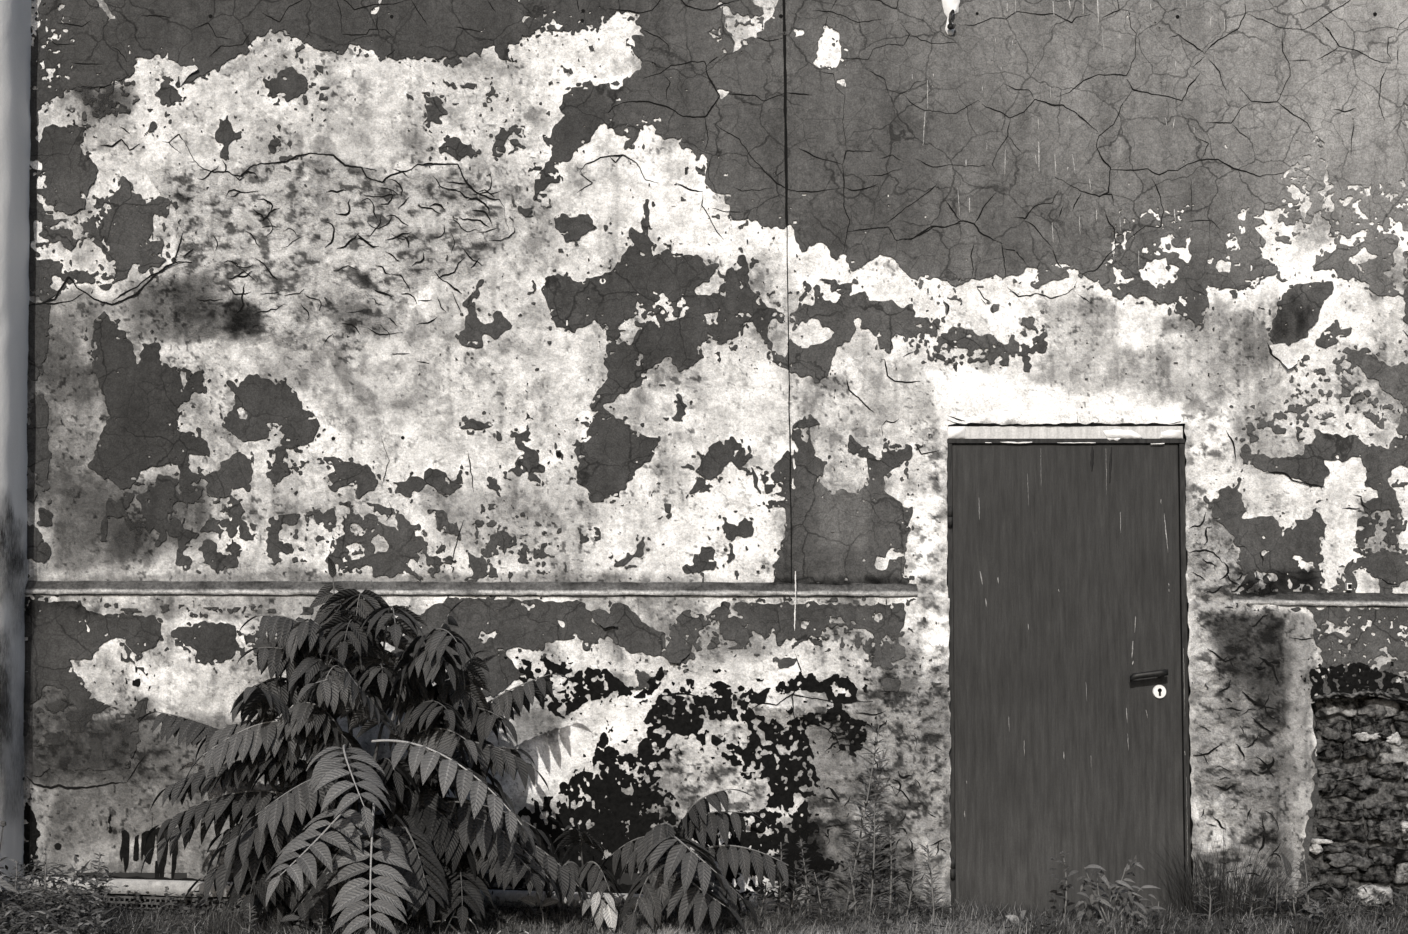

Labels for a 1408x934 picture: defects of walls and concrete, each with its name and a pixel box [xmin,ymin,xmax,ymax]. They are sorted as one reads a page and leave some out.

peeling [709,0,778,61]
peeling [793,25,848,87]
crack [29,127,515,364]
crack [577,0,1405,584]
peeling [1104,224,1134,290]
peeling [1139,234,1192,288]
peeling [1207,208,1249,272]
peeling [1103,429,1142,441]
crack [452,453,474,560]
damp [0,504,23,590]
peeling [1353,566,1382,593]
peeling [23,595,325,880]